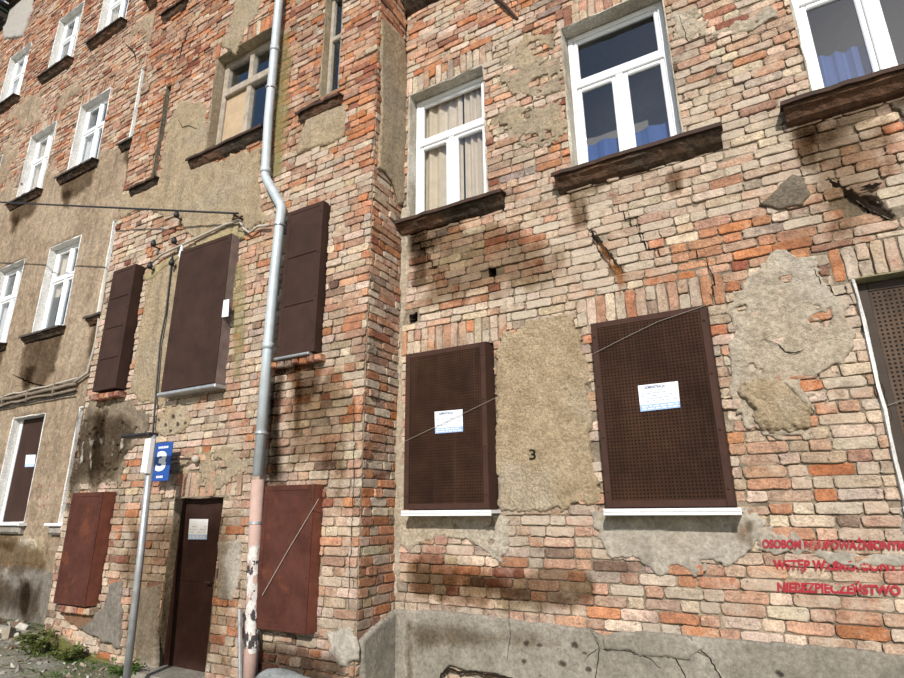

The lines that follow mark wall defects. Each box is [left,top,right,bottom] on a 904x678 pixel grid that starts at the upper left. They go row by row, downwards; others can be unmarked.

spalling [440,665,512,678]
crack [587,630,686,678]
crack [687,634,724,678]